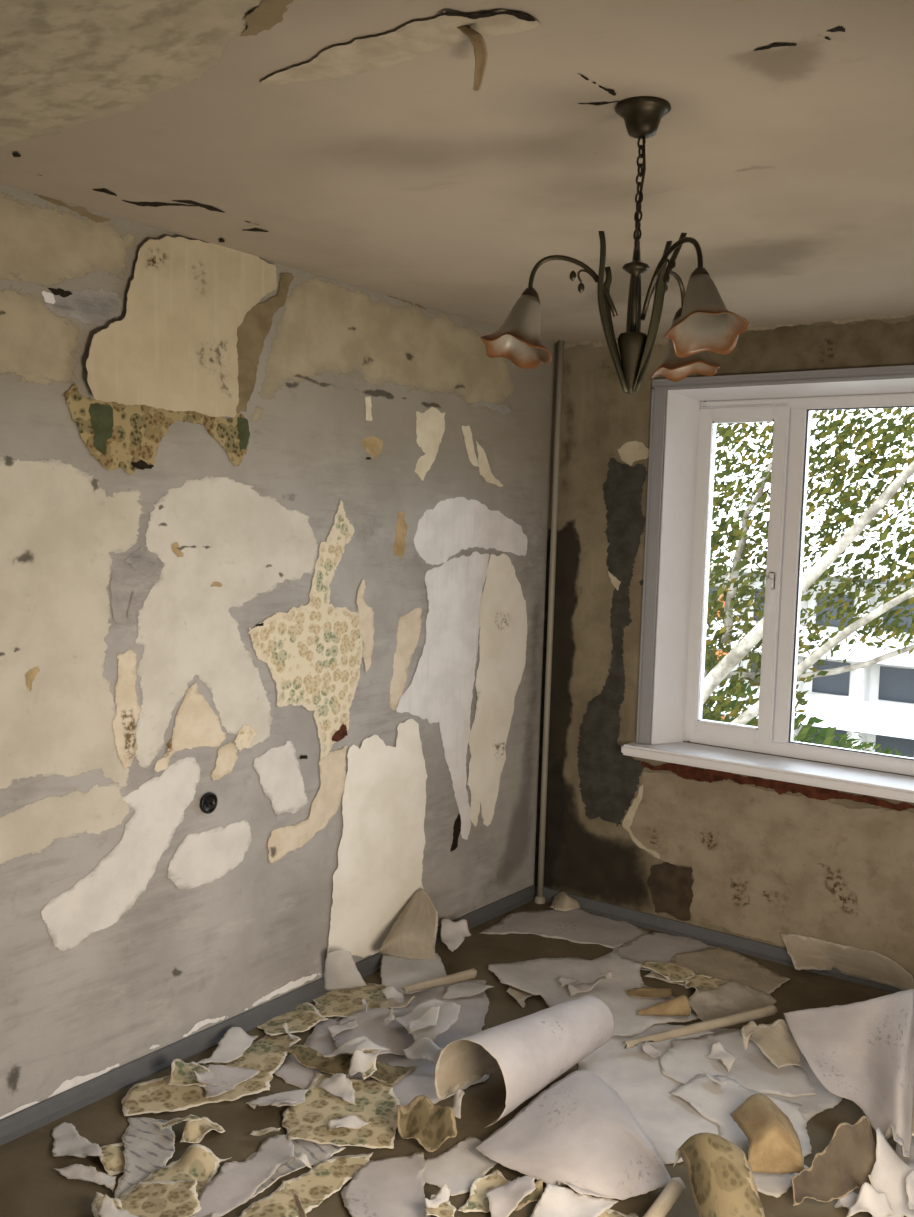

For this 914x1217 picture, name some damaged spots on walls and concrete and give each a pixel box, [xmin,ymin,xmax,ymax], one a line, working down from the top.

peeling [0,0,293,147]
peeling [260,11,542,91]
flaking render [42,286,122,327]
peeling [365,396,373,421]
peeling [131,460,154,470]
peeling [462,426,503,487]
flaking render [125,547,159,577]
peeling [356,579,375,673]
peeling [577,441,914,826]
peeling [467,553,527,827]
peeling [267,746,348,863]